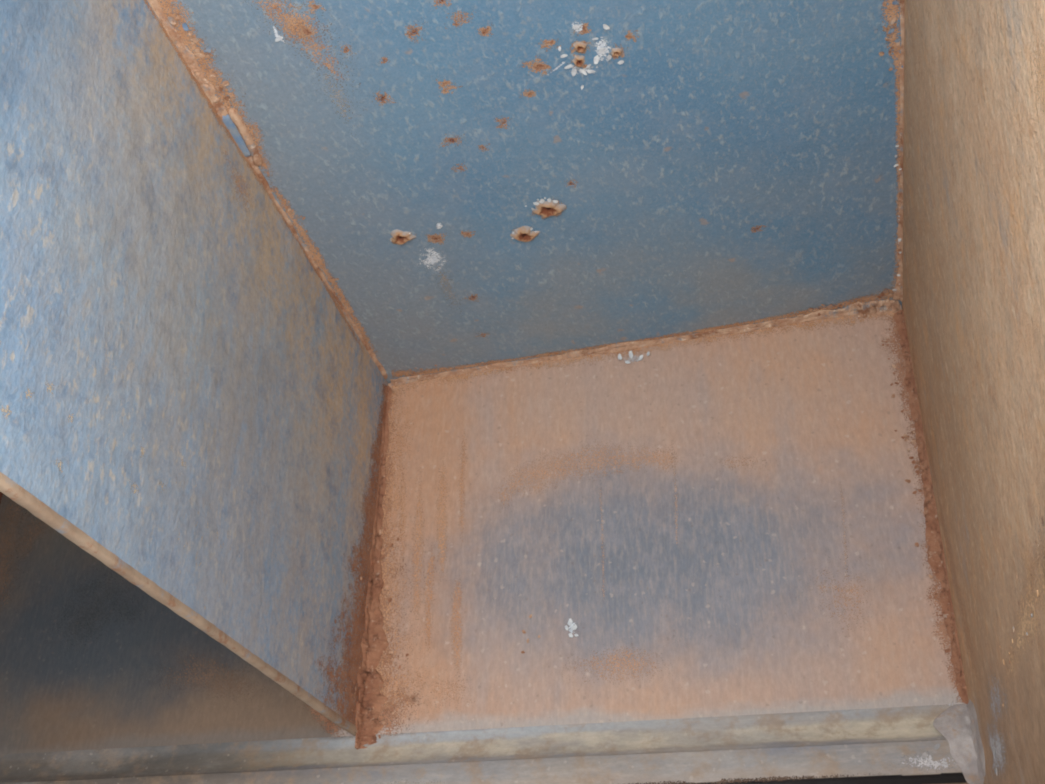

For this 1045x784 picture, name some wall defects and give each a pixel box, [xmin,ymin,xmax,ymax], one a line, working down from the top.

peeling [216,100,262,201]
corrosion [144,0,968,750]